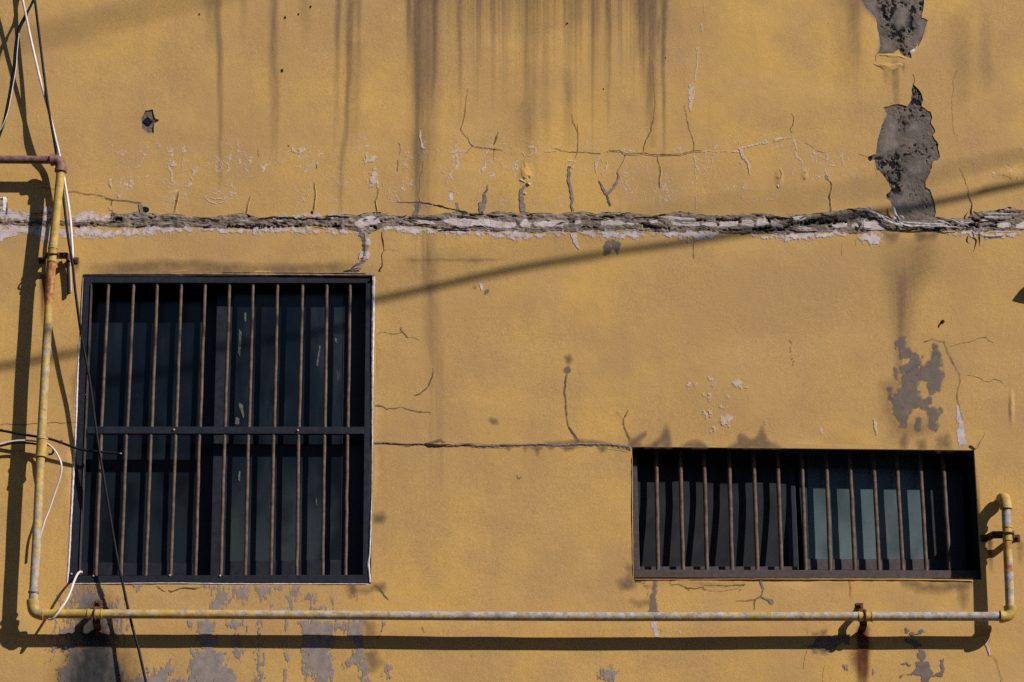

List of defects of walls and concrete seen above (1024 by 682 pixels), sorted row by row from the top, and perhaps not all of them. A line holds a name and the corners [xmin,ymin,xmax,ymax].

flaking render [141,110,159,134]
crack [461,88,499,153]
crack [555,60,702,211]
flaking render [858,0,958,230]
crack [374,143,488,216]
crack [518,185,526,212]
crack [825,168,833,212]
crack [374,370,632,451]
crack [924,323,1004,420]
peeling [43,585,393,682]